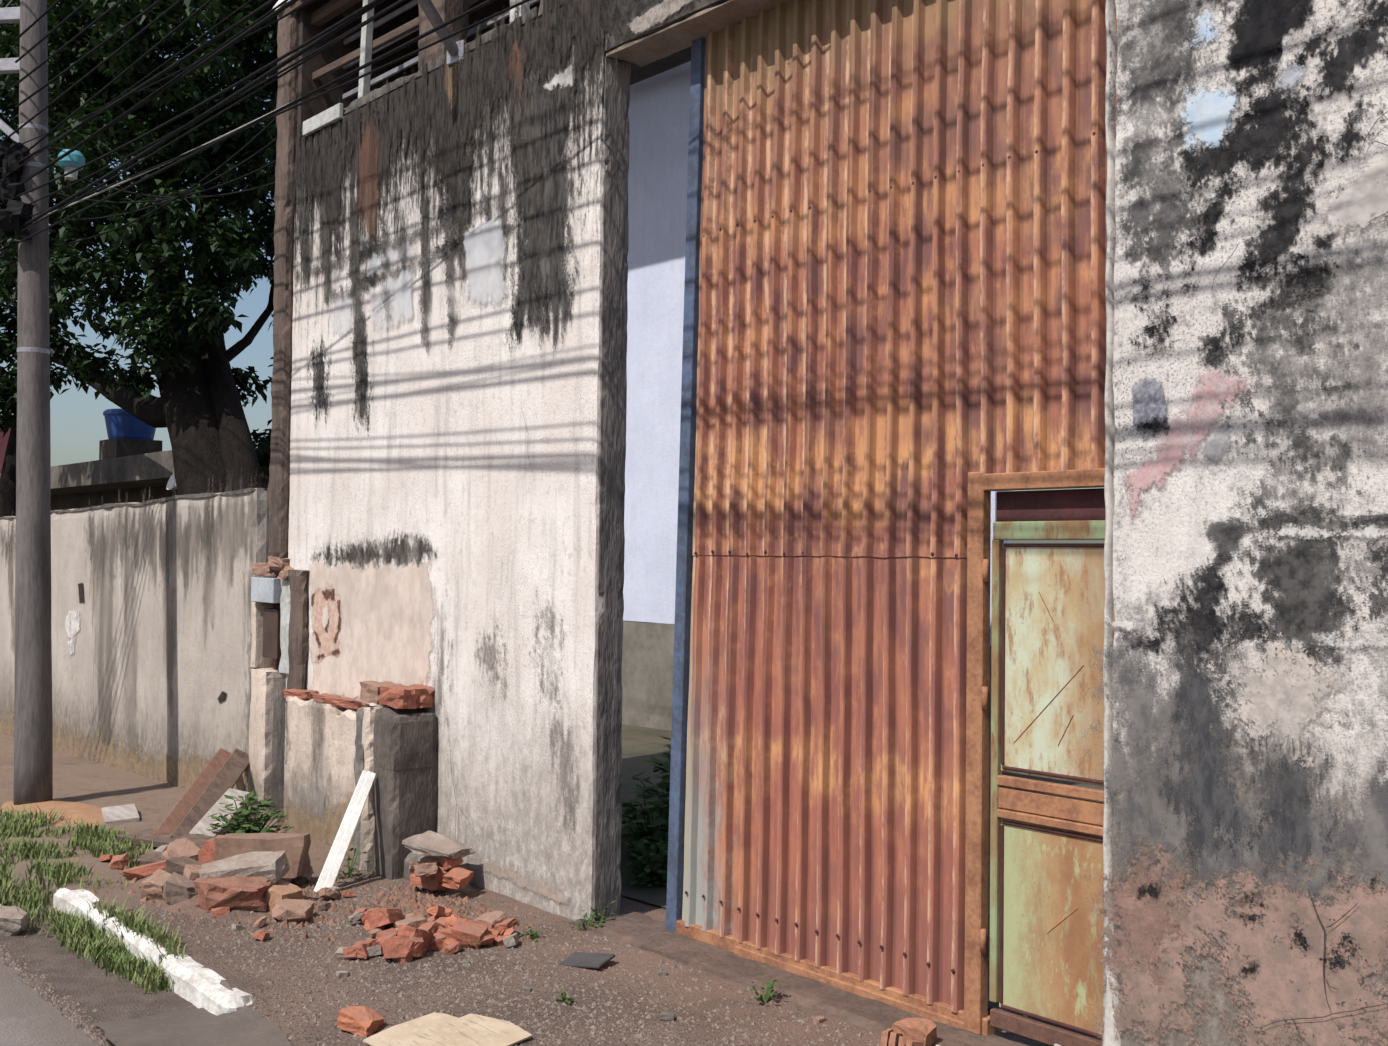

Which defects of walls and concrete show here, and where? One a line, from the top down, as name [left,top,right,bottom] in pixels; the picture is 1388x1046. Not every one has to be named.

spalling [627,0,693,34]
water stain [292,0,669,440]
peeling [1125,370,1249,516]
water stain [1084,0,1388,905]
water stain [1,515,16,657]
water stain [53,475,264,791]
flaking render [310,583,342,665]
water stain [311,530,437,569]